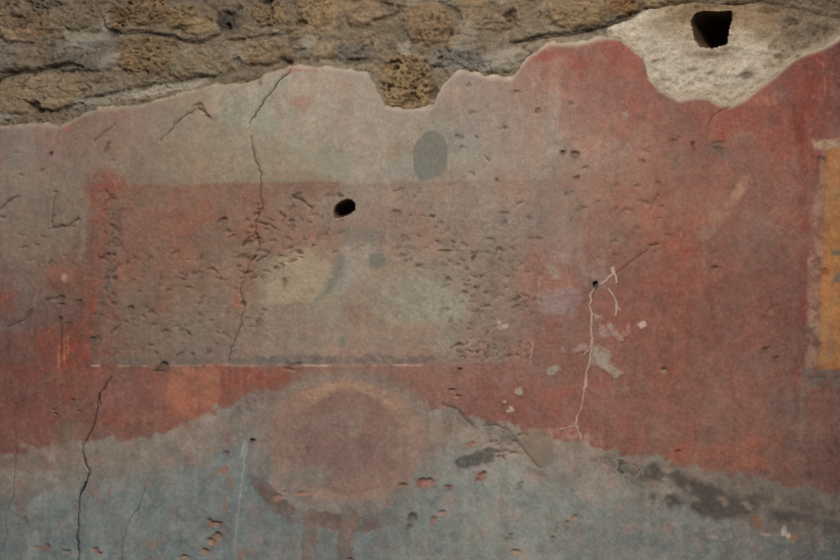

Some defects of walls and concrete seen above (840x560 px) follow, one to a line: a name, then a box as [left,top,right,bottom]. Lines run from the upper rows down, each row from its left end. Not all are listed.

spalling [606,2,840,104]
crack [229,70,290,358]
damp [547,262,618,323]
crack [76,378,111,560]